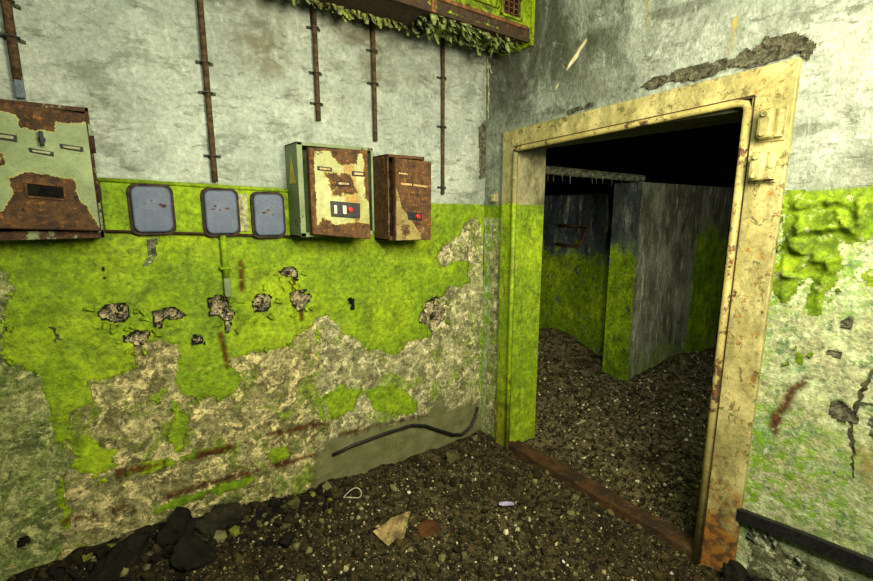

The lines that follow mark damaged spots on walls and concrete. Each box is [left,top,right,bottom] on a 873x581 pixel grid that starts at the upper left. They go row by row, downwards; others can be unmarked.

spalling [635,32,817,91]
peeling [0,217,499,581]
rust [771,377,809,433]
rust [266,422,324,435]
crack [848,369,873,478]
rust [114,463,166,475]
rust [187,444,234,460]
rust [163,469,259,500]
rust [272,453,319,467]